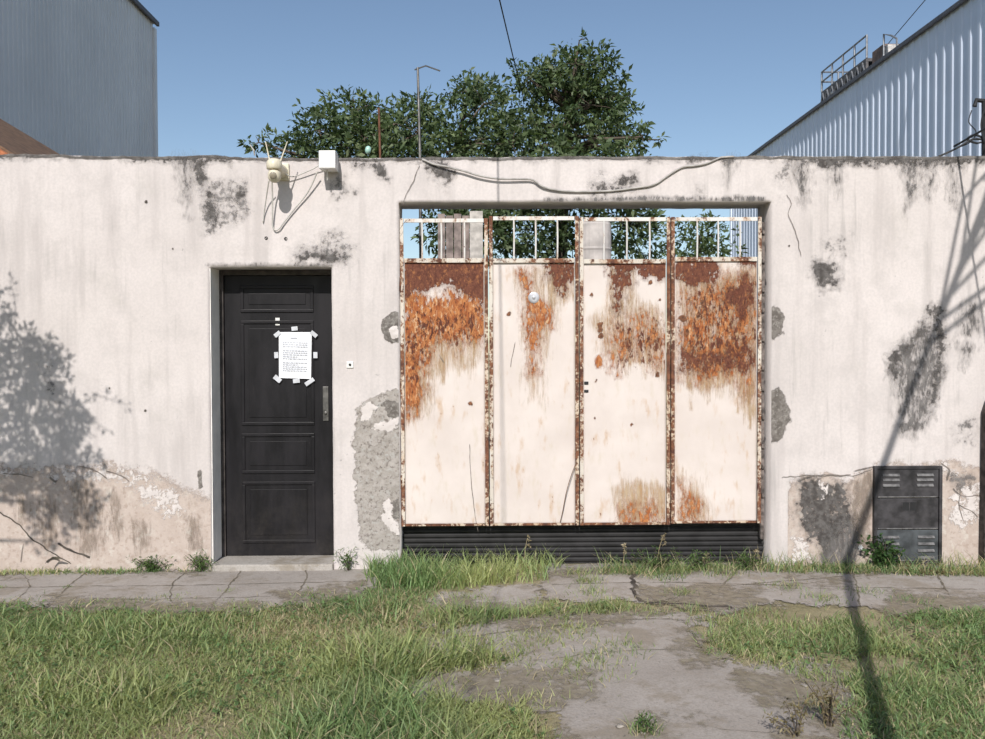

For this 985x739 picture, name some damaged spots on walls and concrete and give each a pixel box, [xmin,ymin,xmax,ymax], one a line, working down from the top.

leakage [0,154,319,233]
leakage [338,155,985,207]
crack [0,512,90,564]
peeling [0,460,211,571]
flaking render [350,388,400,553]
rust [405,263,484,421]
rust [507,263,574,375]
rust [595,261,756,422]
flaking render [771,387,791,443]
leakage [813,261,838,287]
peeling [788,460,981,566]
leakage [888,304,946,433]